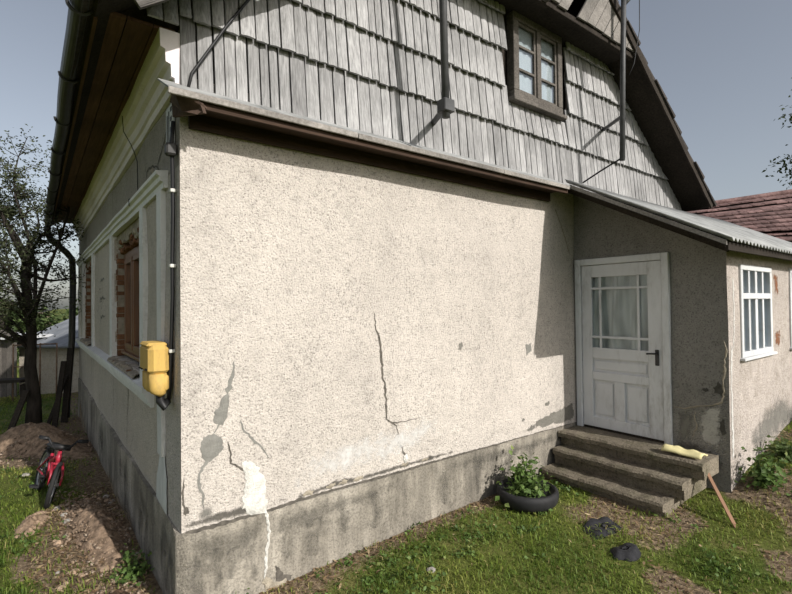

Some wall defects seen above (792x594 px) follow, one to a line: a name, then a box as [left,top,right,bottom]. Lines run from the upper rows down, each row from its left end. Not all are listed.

leakage [191,507,246,526]
crack [181,313,569,534]
leakage [313,452,451,493]
flaking render [674,341,728,447]